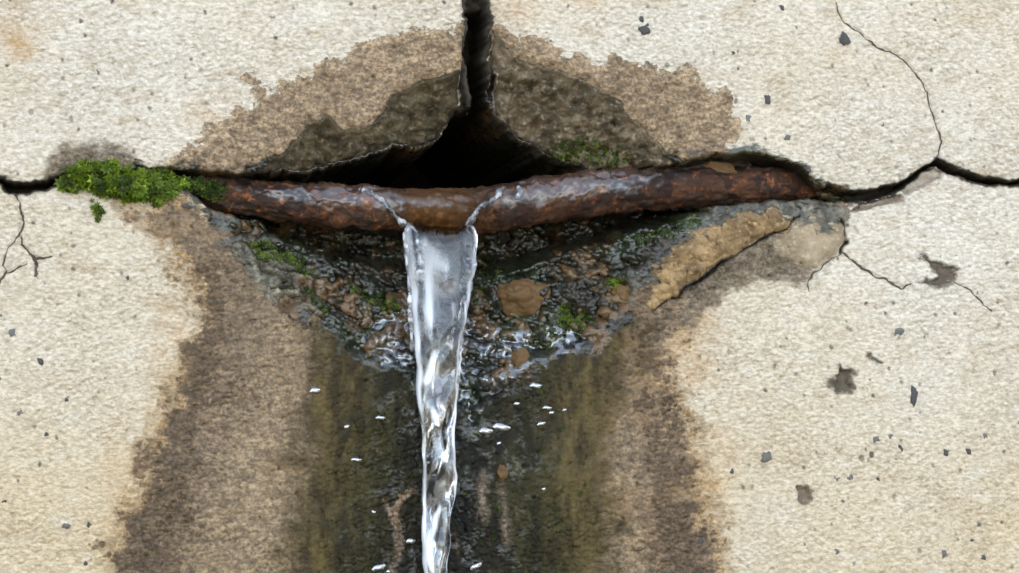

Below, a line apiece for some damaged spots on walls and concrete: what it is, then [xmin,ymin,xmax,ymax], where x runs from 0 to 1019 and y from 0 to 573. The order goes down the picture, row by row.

water stain [168,19,466,175]
crack [458,0,496,115]
water stain [489,23,748,162]
crack [815,3,1019,205]
crack [0,172,67,283]
spalling [132,29,942,442]
crack [654,231,782,310]
crack [807,240,911,292]
spalling [918,254,959,289]
water stain [99,194,332,573]
water stain [592,264,726,573]
spalling [796,485,814,505]